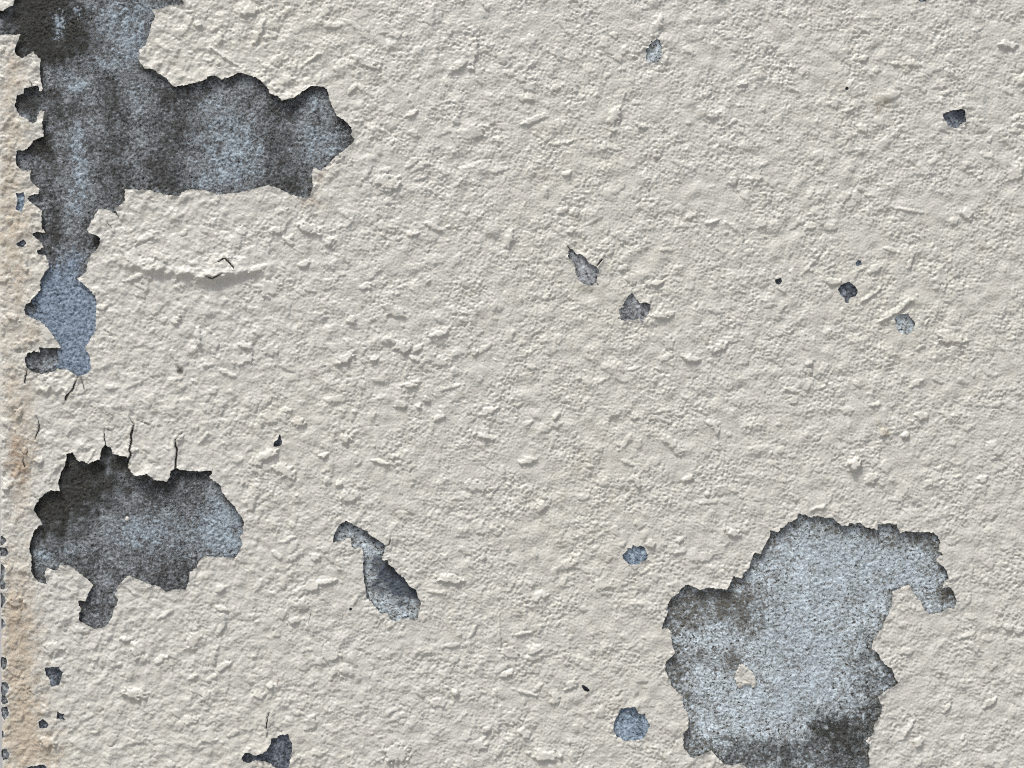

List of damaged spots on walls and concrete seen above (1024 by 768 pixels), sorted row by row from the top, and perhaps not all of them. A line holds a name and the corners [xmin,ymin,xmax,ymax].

peeling [940,106,969,131]
peeling [0,0,358,379]
peeling [565,245,601,288]
peeling [835,257,864,305]
peeling [616,290,654,326]
crack [104,418,148,459]
crack [171,438,179,469]
peeling [27,442,247,631]
peeling [330,518,424,623]
peeling [659,511,959,768]
peeling [611,703,652,744]
peeling [239,731,295,768]